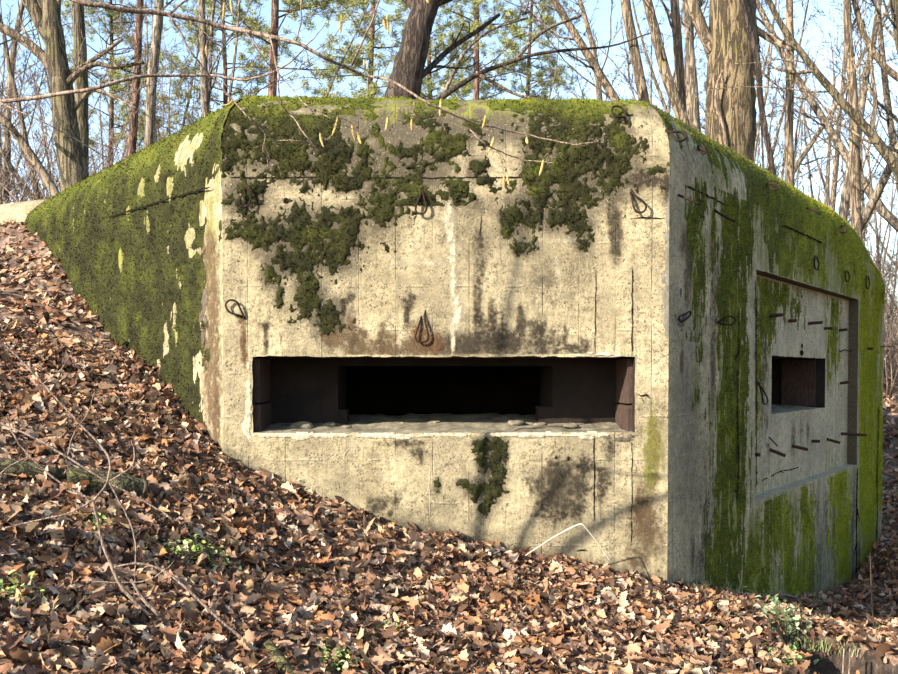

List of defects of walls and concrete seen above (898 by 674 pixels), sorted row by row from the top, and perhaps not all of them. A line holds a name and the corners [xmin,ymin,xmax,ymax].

damp [441,203,588,354]
corrosion [321,313,446,355]
damp [526,440,614,527]